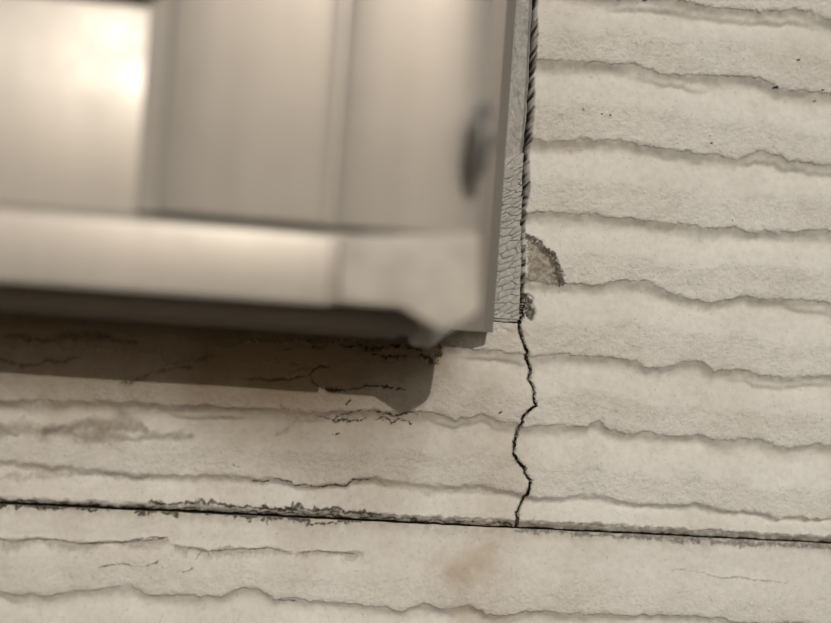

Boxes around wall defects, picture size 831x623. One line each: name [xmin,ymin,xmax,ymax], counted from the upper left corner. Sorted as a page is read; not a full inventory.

peeling [494,152,566,321]
crack [241,365,412,435]
crack [500,311,538,525]